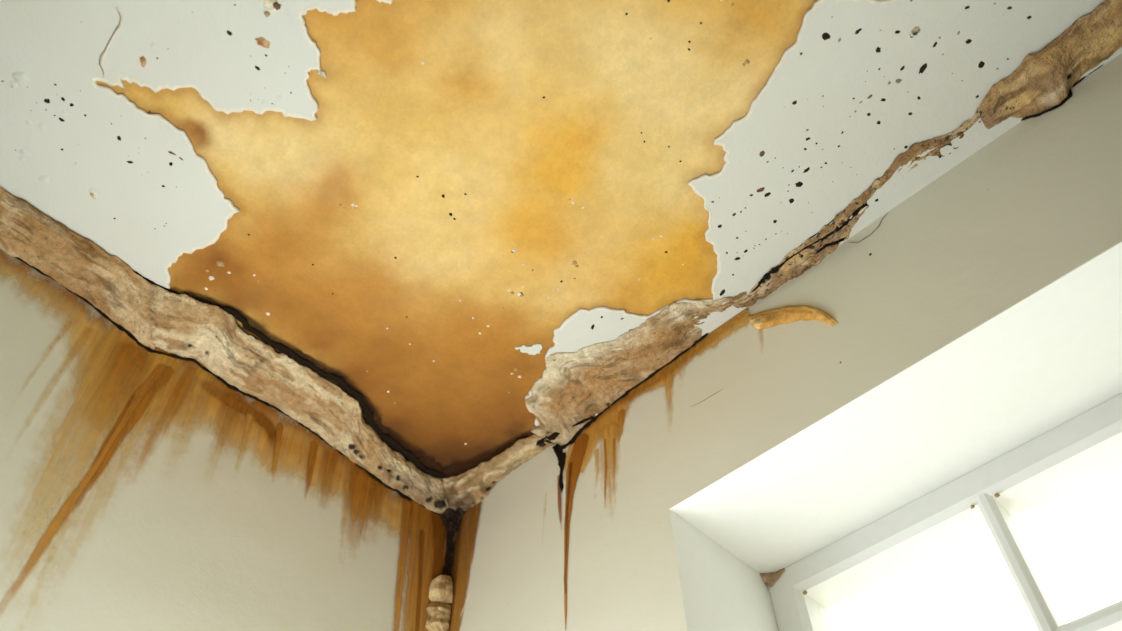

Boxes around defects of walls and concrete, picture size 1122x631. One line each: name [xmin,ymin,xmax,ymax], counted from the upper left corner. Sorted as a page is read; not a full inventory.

crack [13,256,467,578]
leakage [0,251,482,631]
crack [133,270,709,492]
flaking render [0,108,982,514]
leakage [91,0,896,478]
leakage [557,309,750,630]
crack [750,199,888,294]
leakage [849,66,921,124]
crack [1021,64,1104,121]